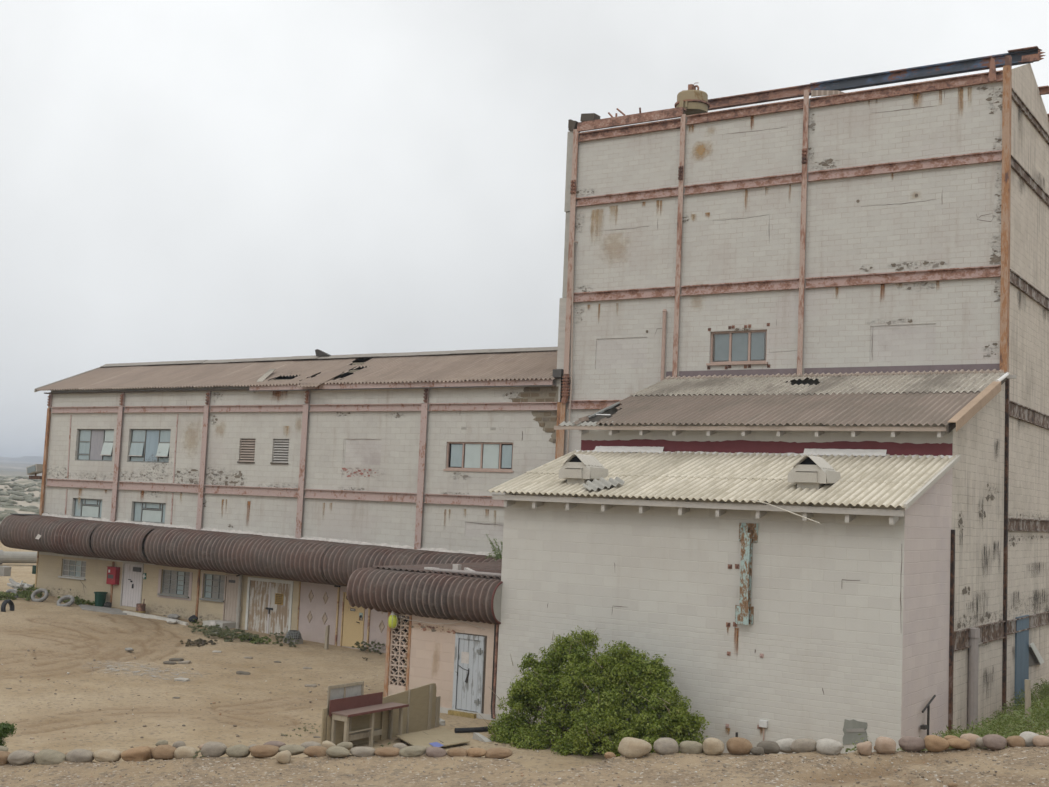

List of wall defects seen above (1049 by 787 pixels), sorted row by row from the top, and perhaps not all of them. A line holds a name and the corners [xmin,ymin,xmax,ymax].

peeling [891,261,945,271]
peeling [122,457,244,494]